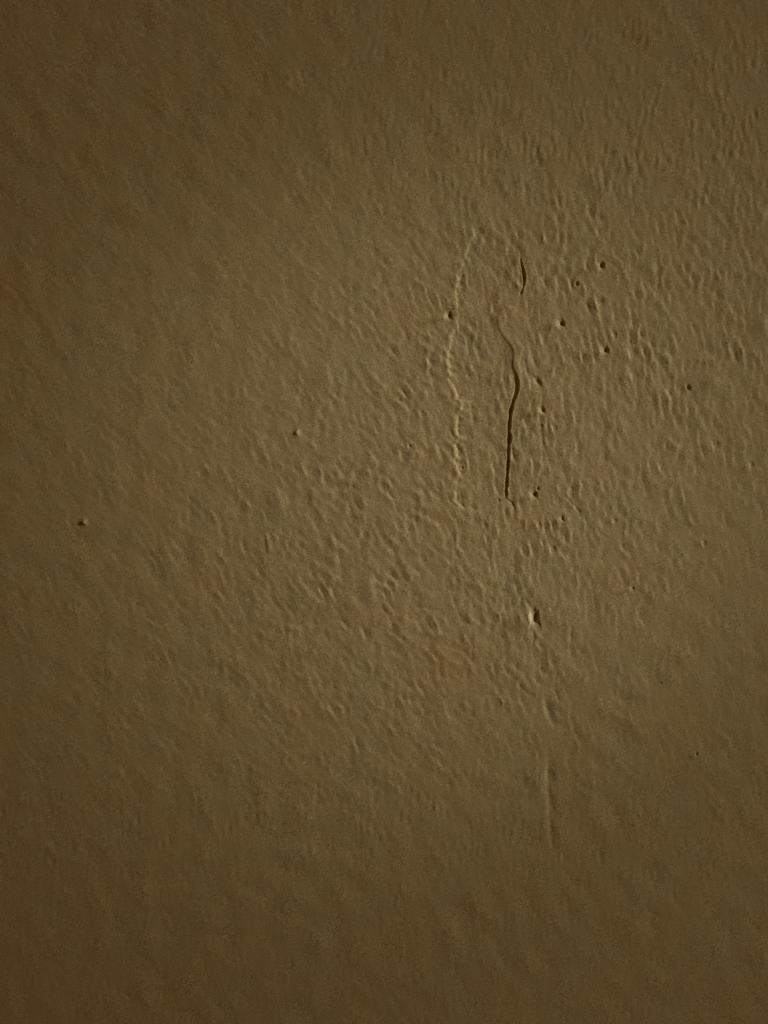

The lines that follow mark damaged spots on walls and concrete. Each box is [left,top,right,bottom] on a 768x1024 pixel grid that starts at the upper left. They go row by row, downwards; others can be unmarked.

crack [483,250,538,501]